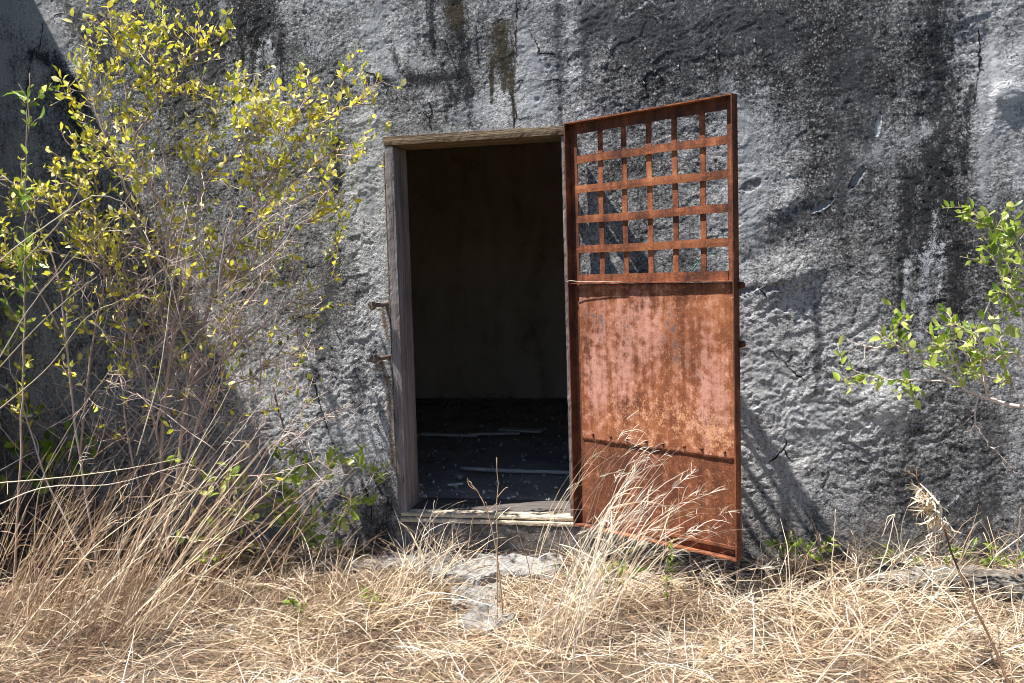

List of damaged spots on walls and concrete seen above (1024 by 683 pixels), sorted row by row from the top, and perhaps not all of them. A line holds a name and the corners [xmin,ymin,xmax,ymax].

leakage [363,0,516,129]
crack [972,30,985,106]
leakage [740,0,1024,353]
crack [765,346,807,381]